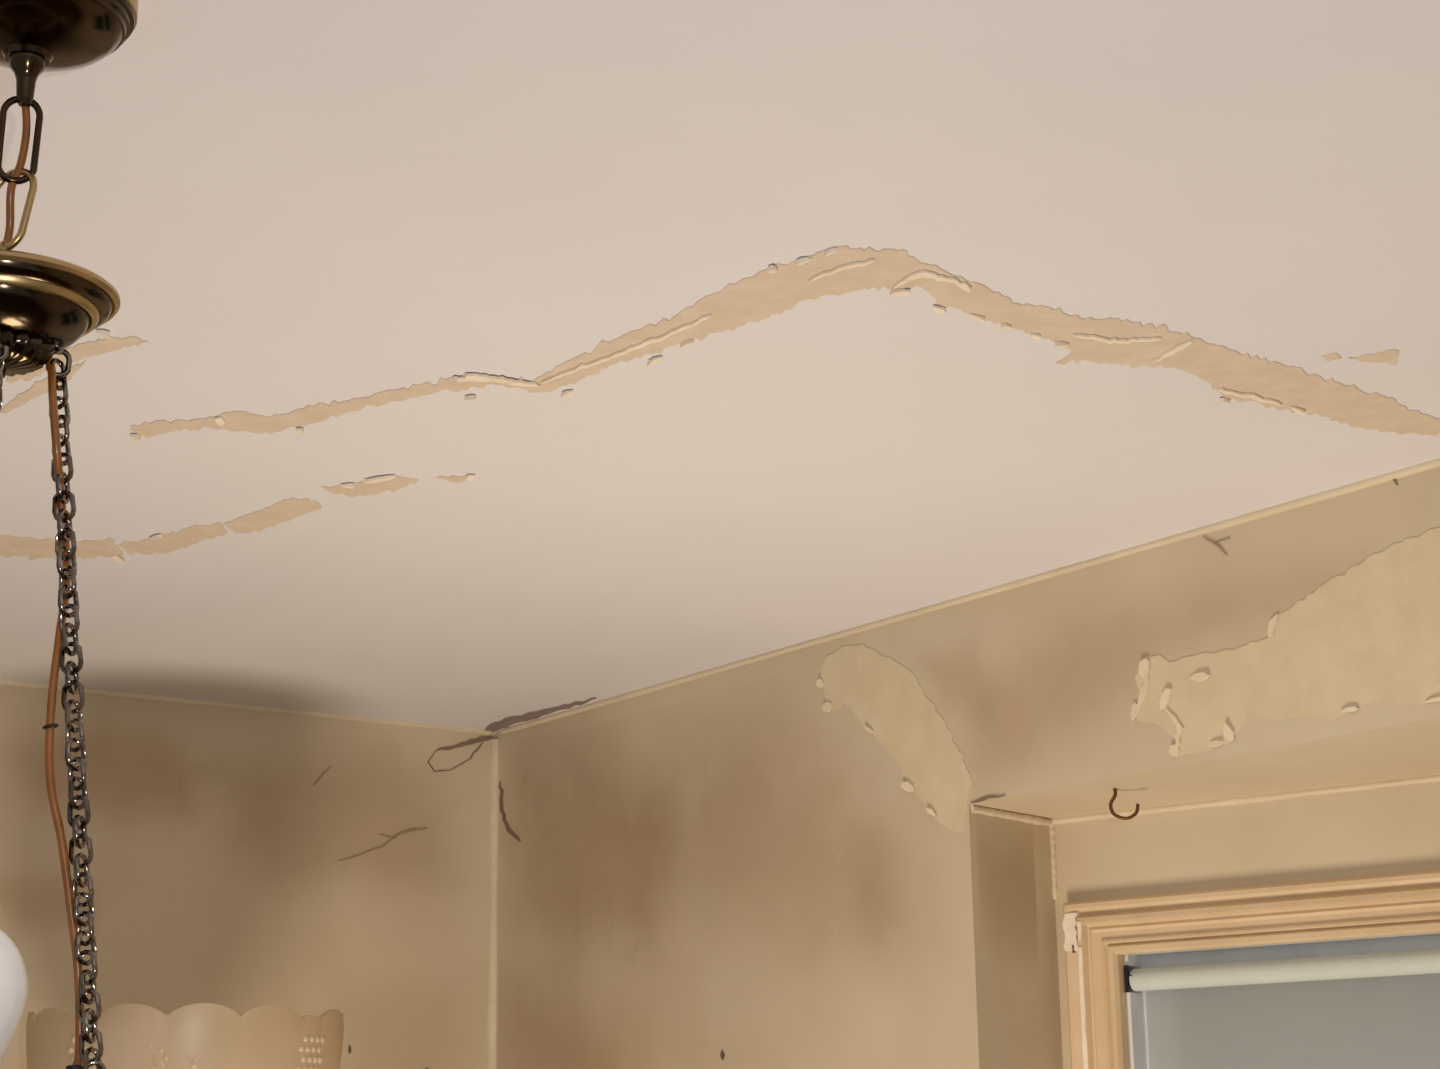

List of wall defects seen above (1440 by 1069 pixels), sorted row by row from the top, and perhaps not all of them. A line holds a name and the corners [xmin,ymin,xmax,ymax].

peeling [0,330,148,414]
peeling [130,245,1440,442]
peeling [0,475,419,564]
peeling [436,474,475,483]
peeling [1131,527,1440,757]
crack [427,697,597,772]
peeling [816,644,972,832]
crack [338,827,428,861]
crack [499,781,521,842]